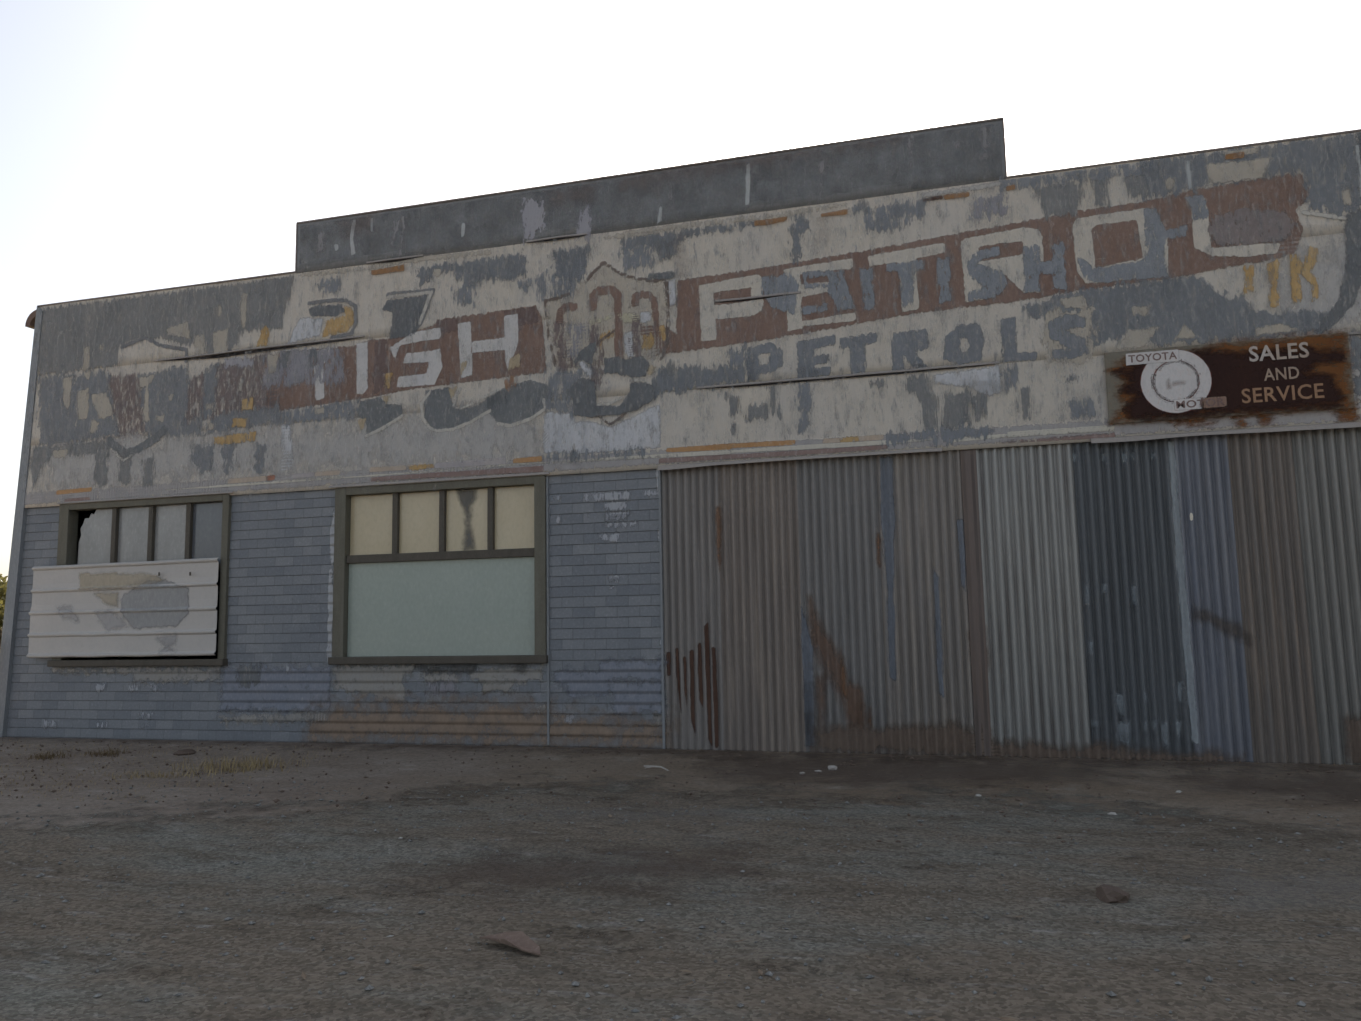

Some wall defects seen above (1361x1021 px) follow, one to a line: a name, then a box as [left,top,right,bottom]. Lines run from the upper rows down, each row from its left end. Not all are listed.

peeling [617,132,1361,273]
peeling [415,244,593,309]
peeling [1022,275,1328,350]
peeling [29,274,360,487]
peeling [544,361,596,420]
peeling [652,342,812,435]
peeling [885,362,1032,448]
peeling [1067,374,1096,420]
corrosion [1335,408,1359,422]
peeling [584,469,660,543]
peeling [52,512,667,726]
corrosion [666,623,719,748]